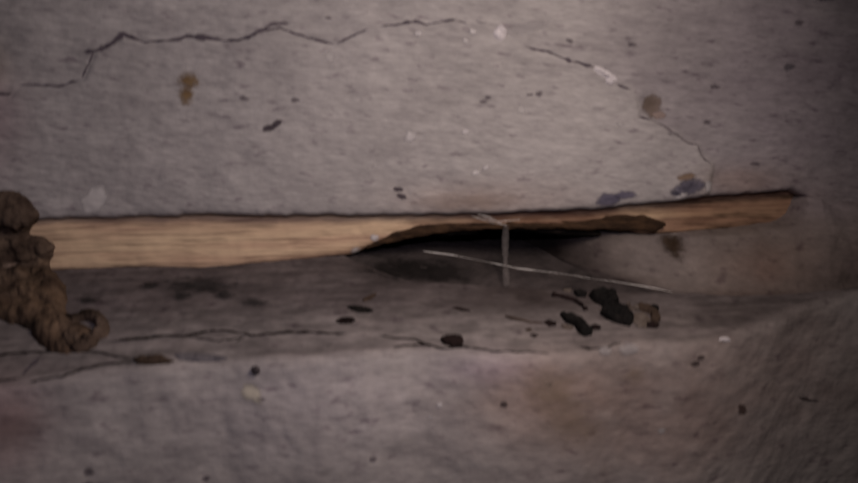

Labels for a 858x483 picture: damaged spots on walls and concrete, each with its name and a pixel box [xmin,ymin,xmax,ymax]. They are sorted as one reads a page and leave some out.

crack [0,19,486,95]
rust [180,76,198,104]
spalling [81,186,107,214]
spalling [663,236,681,257]
crack [0,329,347,382]